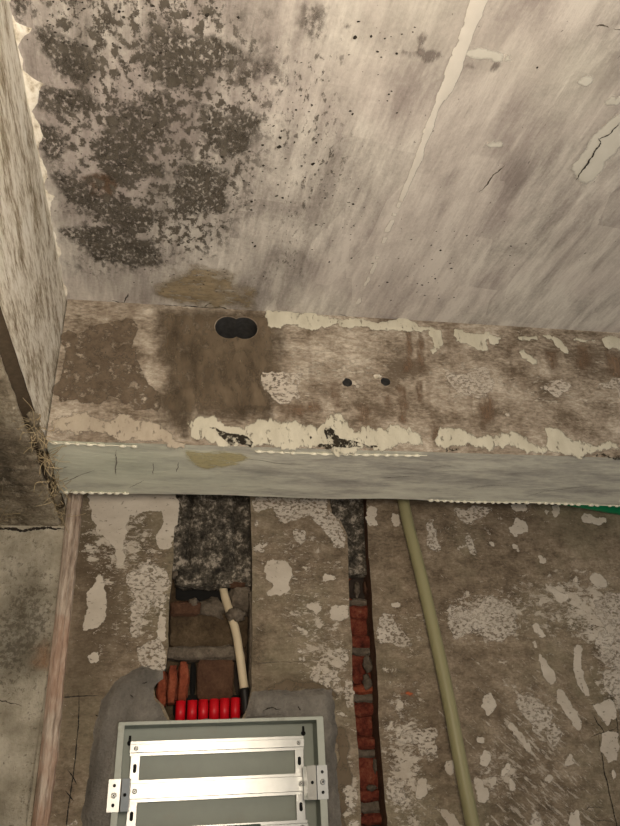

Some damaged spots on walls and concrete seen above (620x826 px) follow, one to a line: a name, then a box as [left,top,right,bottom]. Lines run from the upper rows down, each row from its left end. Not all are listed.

crack [576,124,619,180]
damp [12,0,342,437]
flaking render [51,318,423,457]
flaking render [265,310,443,354]
flaking render [435,427,620,460]
crack [0,525,61,533]
flaking render [87,493,180,566]
flaking render [83,574,107,631]
flaking render [126,559,229,719]
flaking render [508,623,582,753]
flaking render [590,572,620,779]
crack [584,695,620,826]